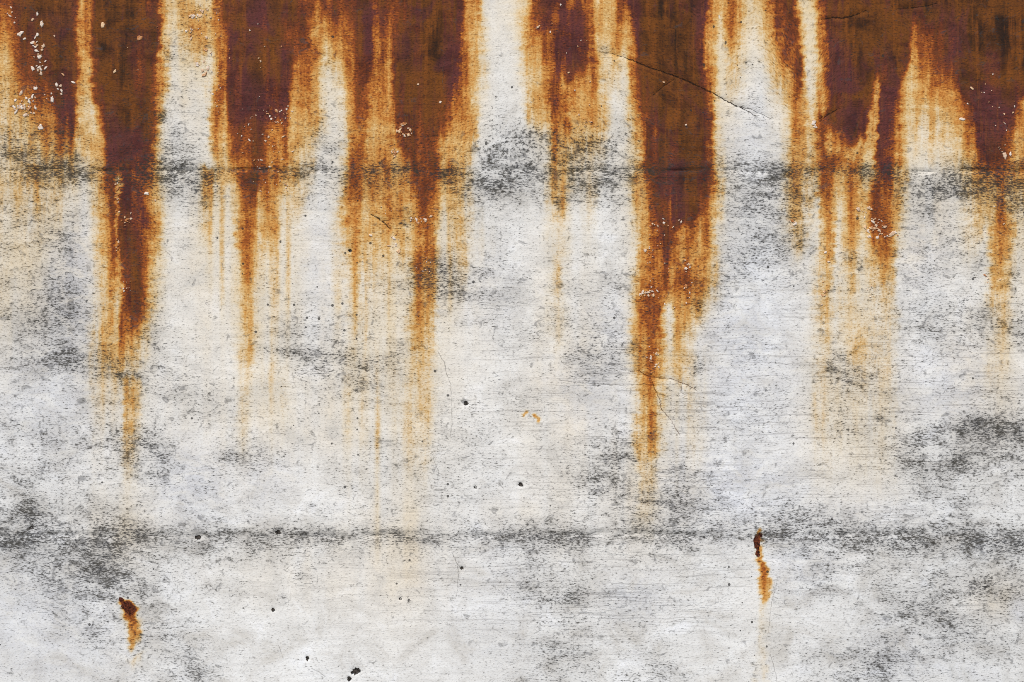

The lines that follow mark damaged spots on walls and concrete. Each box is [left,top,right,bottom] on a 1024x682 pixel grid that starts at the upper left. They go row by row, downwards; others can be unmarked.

damp [0,42,1024,317]
rust [0,0,1024,535]
crack [612,53,771,119]
rust [370,546,447,624]
damp [0,448,1024,682]
rust [747,551,778,682]